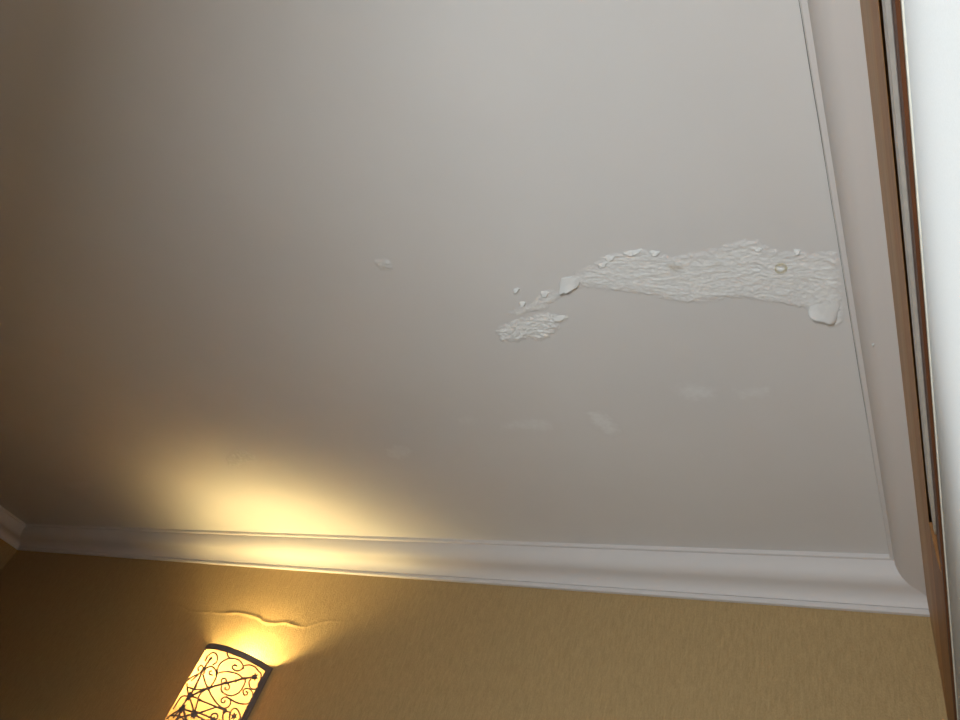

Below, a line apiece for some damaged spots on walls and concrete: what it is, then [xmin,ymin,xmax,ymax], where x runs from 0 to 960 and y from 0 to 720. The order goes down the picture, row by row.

flaking render [493,238,848,343]